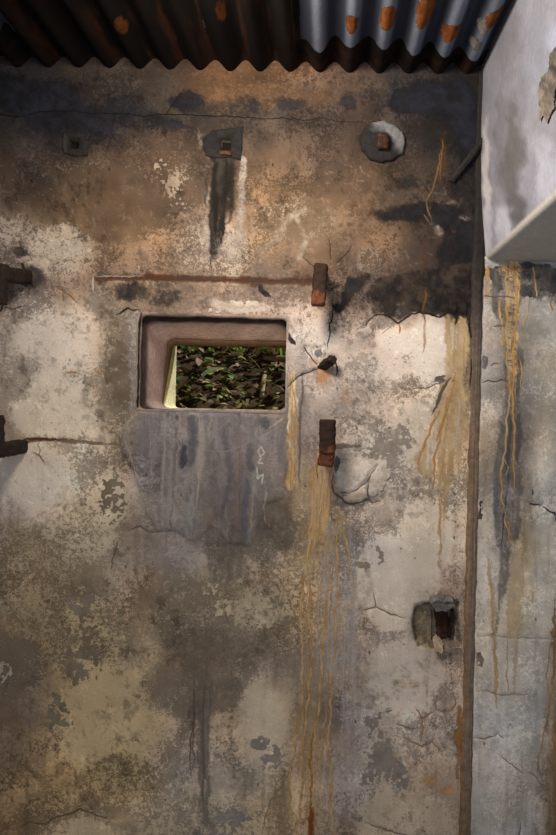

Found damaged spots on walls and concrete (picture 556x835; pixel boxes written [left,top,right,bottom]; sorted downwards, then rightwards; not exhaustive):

crack [0,92,350,122]
damp [203,147,246,264]
crack [366,311,458,326]
rust [285,371,303,494]
crack [331,469,382,505]
rust [415,315,470,565]
rust [484,261,529,544]
rust [288,451,356,835]
spalling [412,601,461,650]
rust [487,550,524,703]
damp [192,668,210,827]
crack [21,808,110,827]